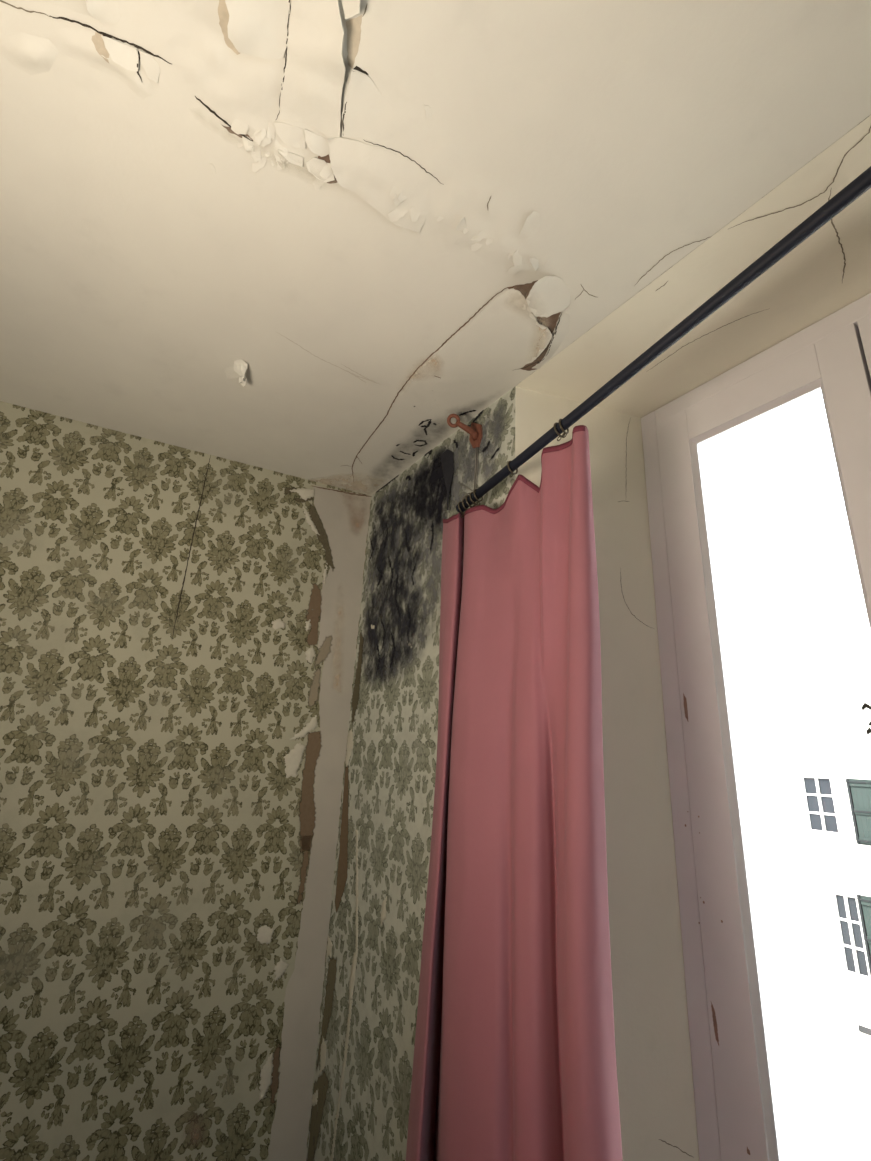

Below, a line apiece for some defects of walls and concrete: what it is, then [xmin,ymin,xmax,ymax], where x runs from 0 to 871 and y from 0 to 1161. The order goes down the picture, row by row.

crack [0,0,171,81]
peeling [41,0,160,84]
crack [195,96,252,141]
peeling [218,0,443,234]
crack [635,126,871,291]
peeling [224,360,248,387]
crack [275,283,529,497]
peeling [401,250,571,400]
crack [515,285,596,370]
crack [646,308,770,372]
leakage [365,410,500,680]
flaking render [257,486,371,1161]